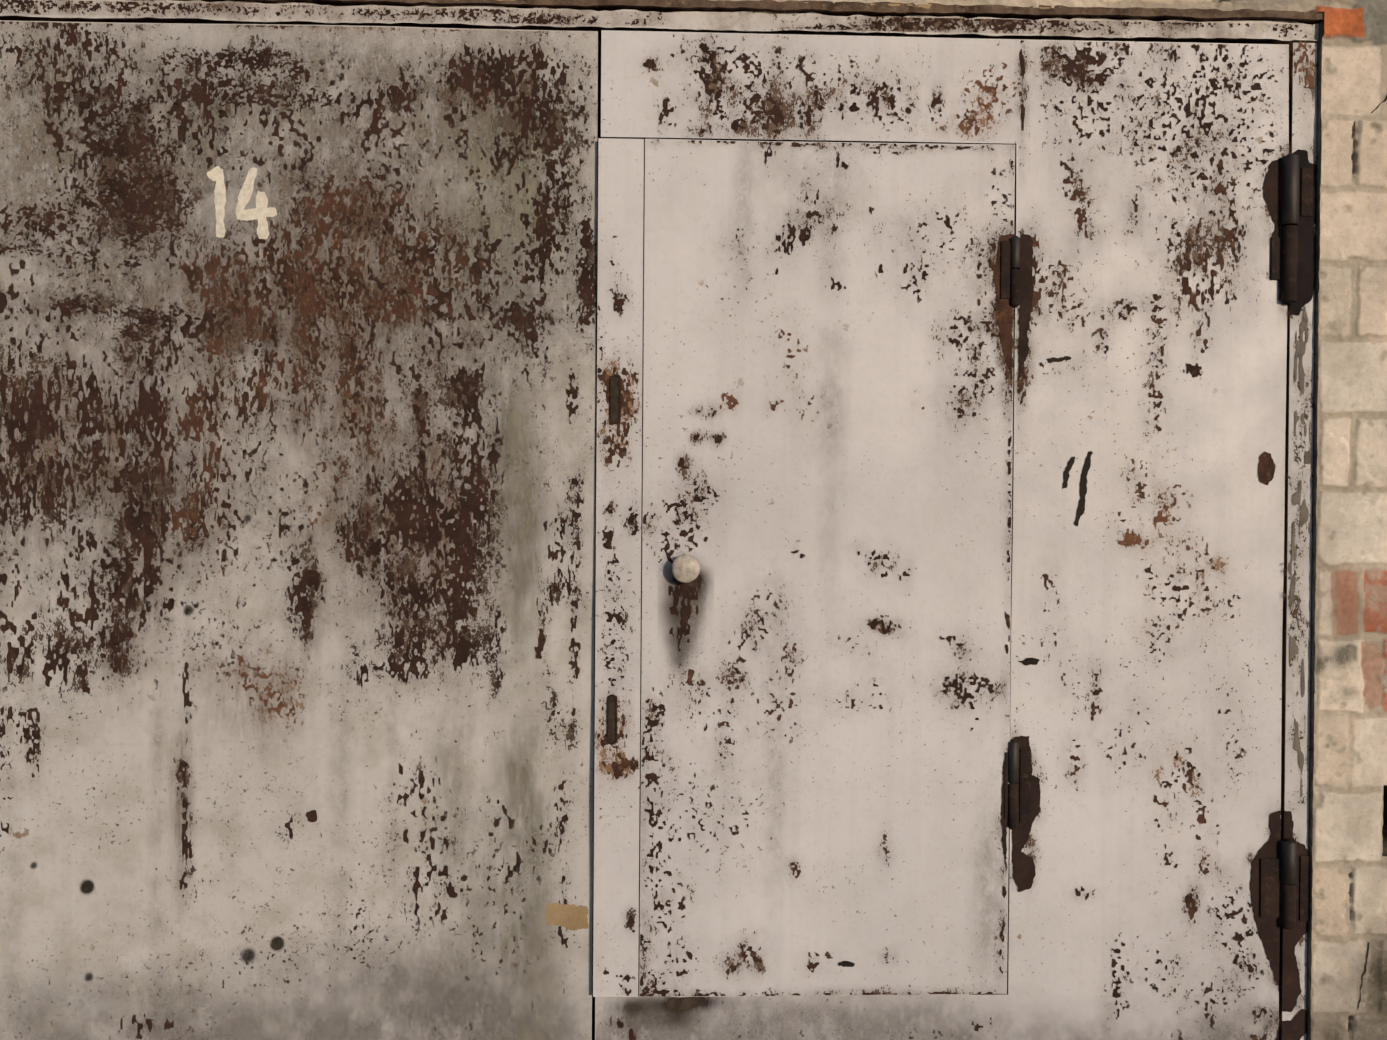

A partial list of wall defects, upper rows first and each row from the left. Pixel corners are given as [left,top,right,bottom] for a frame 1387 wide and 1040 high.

corrosion [640,33,1319,581]
corrosion [0,21,1010,1040]
corrosion [1041,571,1060,612]
corrosion [1057,739,1085,791]
corrosion [1061,659,1107,721]
corrosion [1098,684,1275,1040]